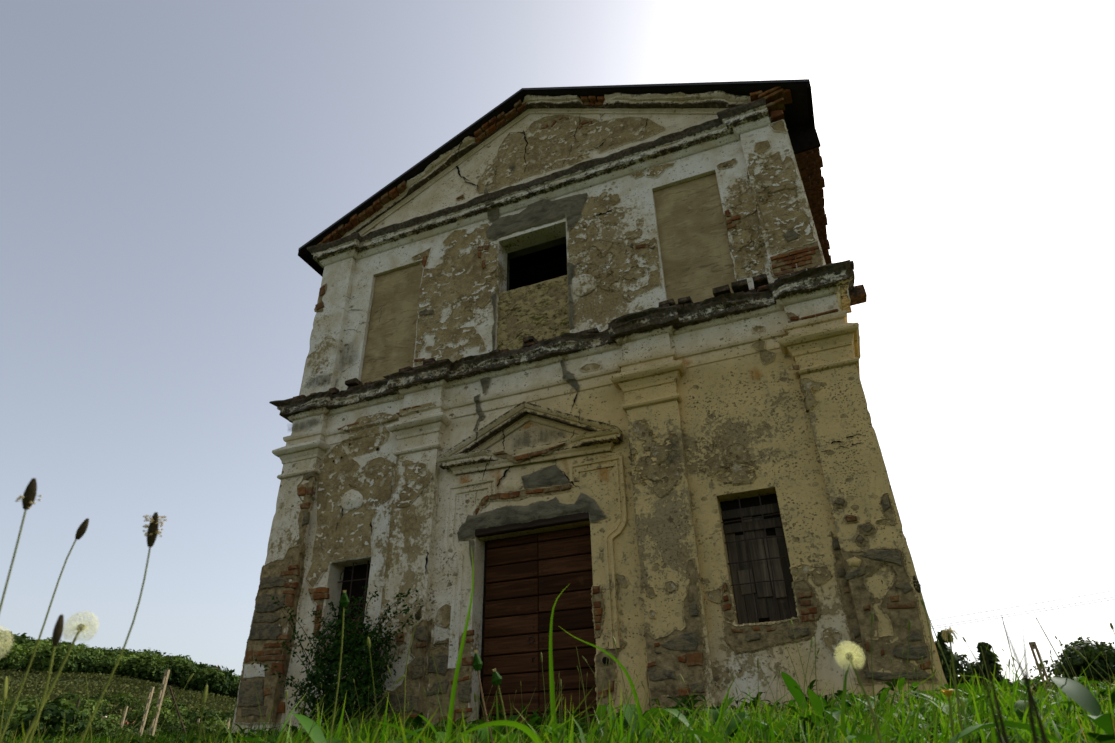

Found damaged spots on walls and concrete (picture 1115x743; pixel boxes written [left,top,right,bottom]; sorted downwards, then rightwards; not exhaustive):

flaking render [411,223,499,366]
flaking render [456,114,666,201]
flaking render [567,182,662,303]
flaking render [630,163,676,179]
flaking render [716,120,823,279]
flaking render [235,402,436,725]
spalling [591,584,627,713]
spalling [643,492,940,711]